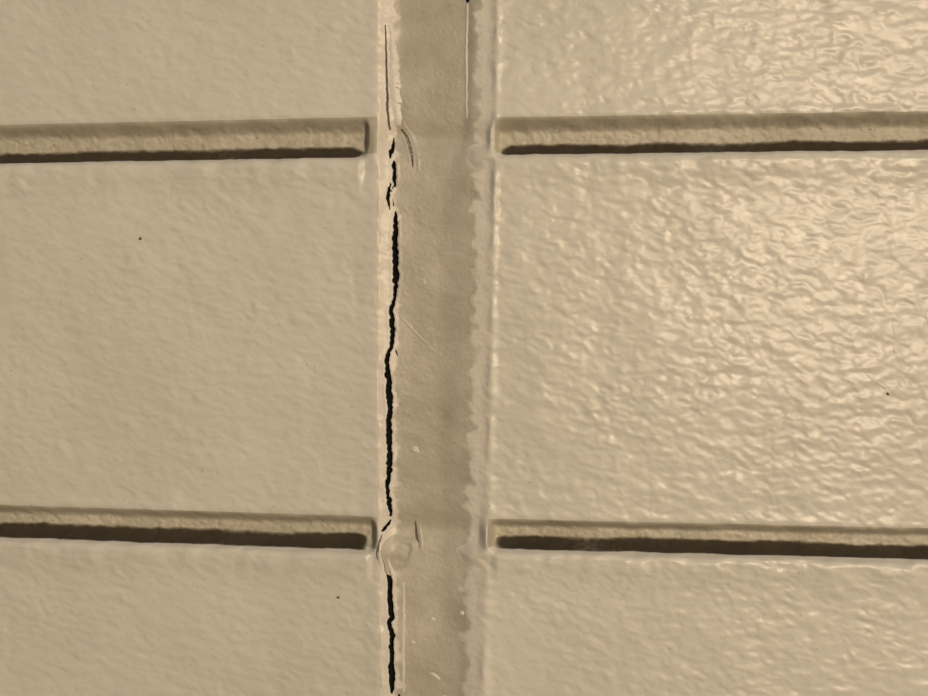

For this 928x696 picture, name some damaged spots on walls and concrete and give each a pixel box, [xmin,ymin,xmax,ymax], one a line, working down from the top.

crack [376,25,402,696]